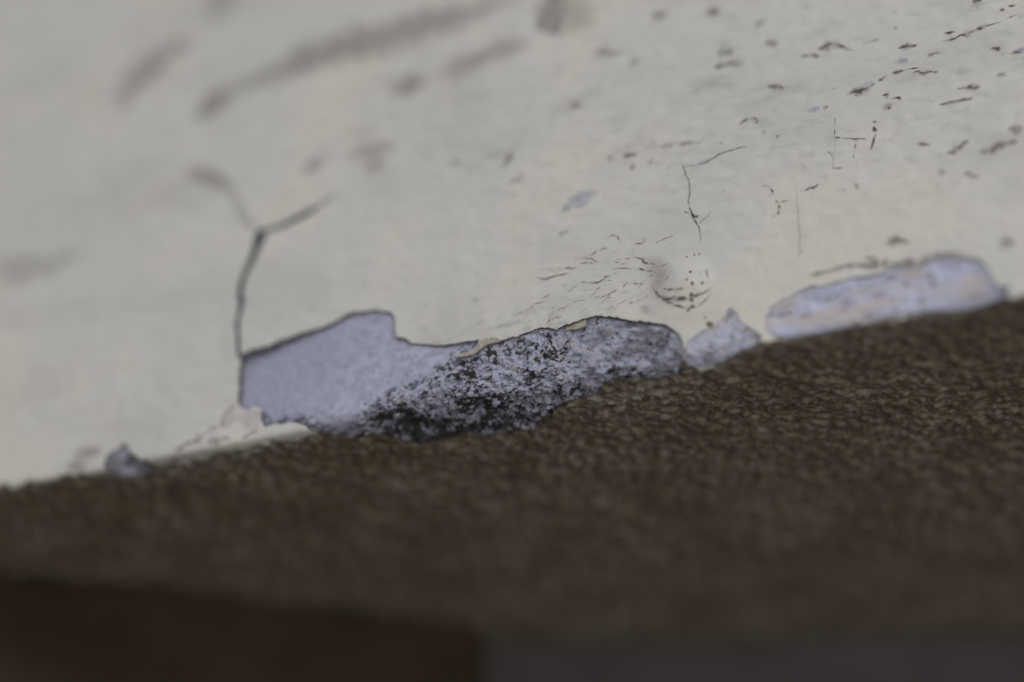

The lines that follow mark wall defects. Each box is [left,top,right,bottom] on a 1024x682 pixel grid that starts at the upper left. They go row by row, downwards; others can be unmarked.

crack [683,146,745,238]
crack [235,198,329,359]
flaking render [221,257,1009,443]